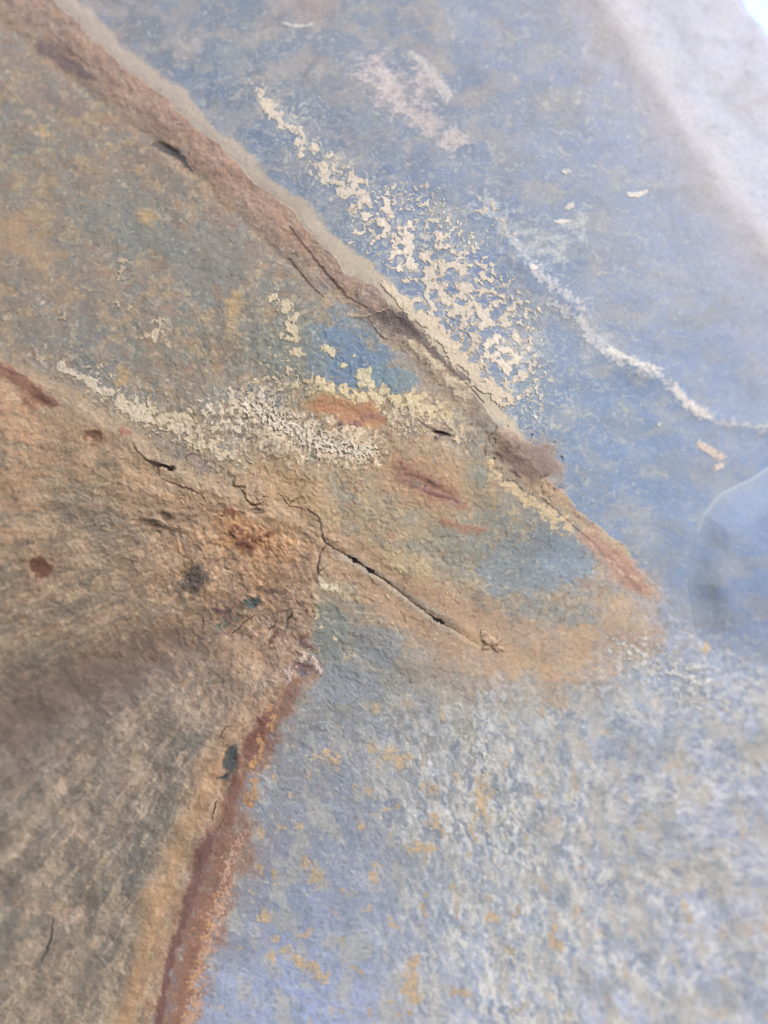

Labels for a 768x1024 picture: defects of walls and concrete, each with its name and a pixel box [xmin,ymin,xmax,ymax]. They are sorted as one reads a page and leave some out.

peeling [249,82,551,419]
peeling [554,202,575,224]
peeling [627,189,648,198]
peeling [56,289,470,515]
crack [133,443,478,644]
rust [131,660,355,1024]